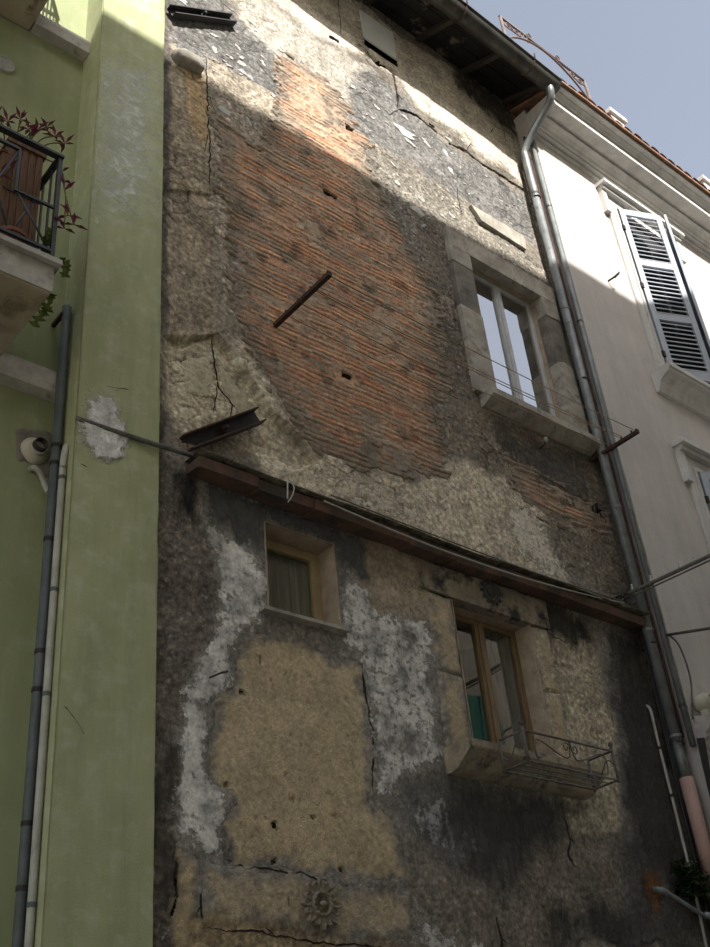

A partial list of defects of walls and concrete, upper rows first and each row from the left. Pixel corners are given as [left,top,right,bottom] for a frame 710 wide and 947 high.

flaking render [209,19,258,82]
crack [337,0,519,188]
flaking render [434,136,488,199]
spalling [205,46,459,533]
crack [211,336,235,416]
spalling [163,516,483,947]
crack [170,859,381,947]